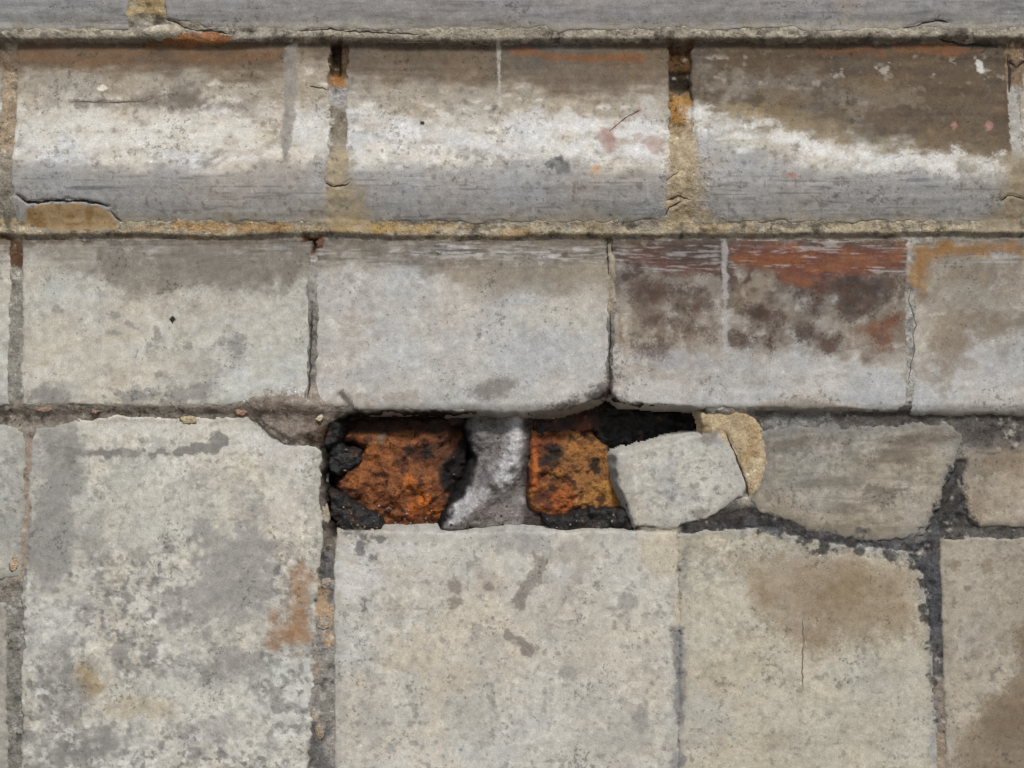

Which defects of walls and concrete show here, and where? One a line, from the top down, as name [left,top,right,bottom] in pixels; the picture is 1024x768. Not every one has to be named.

water stain [676,37,1023,187]
spalling [23,201,119,233]
water stain [374,234,1024,388]
rust [614,231,1024,360]
crack [908,290,917,384]
spalling [333,416,469,525]
spalling [525,429,746,527]
rust [258,556,328,662]
water stain [707,539,938,675]